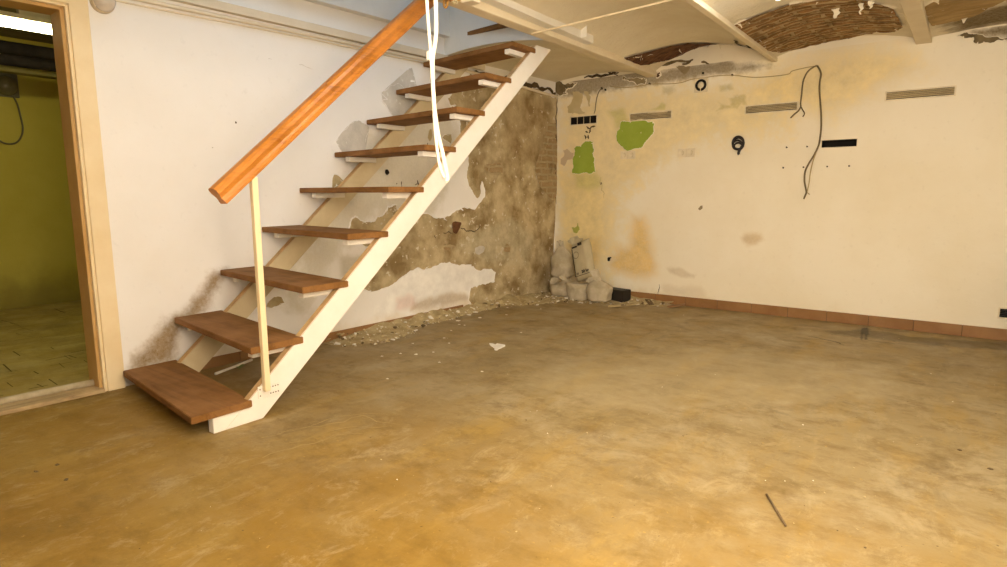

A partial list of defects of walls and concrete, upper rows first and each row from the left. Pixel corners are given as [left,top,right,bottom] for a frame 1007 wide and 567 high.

peeling [380,67,417,116]
flaking render [447,87,496,110]
flaking render [520,81,591,114]
peeling [622,43,720,85]
leakage [541,0,1007,254]
leakage [290,103,460,279]
leakage [424,157,468,218]
flaking render [326,120,673,347]
leakage [122,258,238,385]
leakage [254,287,329,334]
leakage [366,206,541,325]
leakage [655,263,728,301]